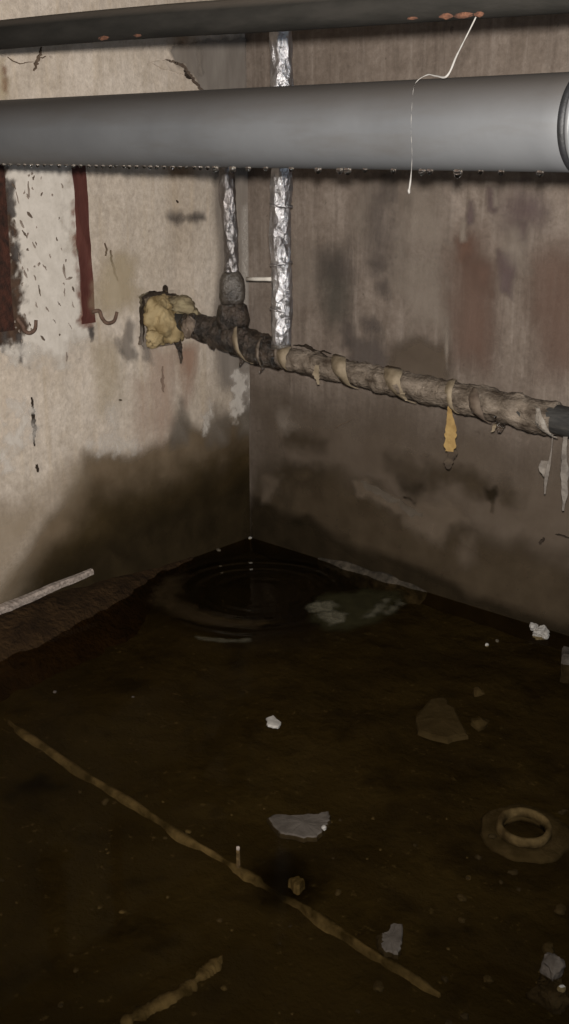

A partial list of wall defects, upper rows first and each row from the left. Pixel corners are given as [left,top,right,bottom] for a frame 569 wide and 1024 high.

crack [7,47,46,71]
leakage [234,168,249,312]
leakage [344,321,450,380]
leakage [0,350,569,636]